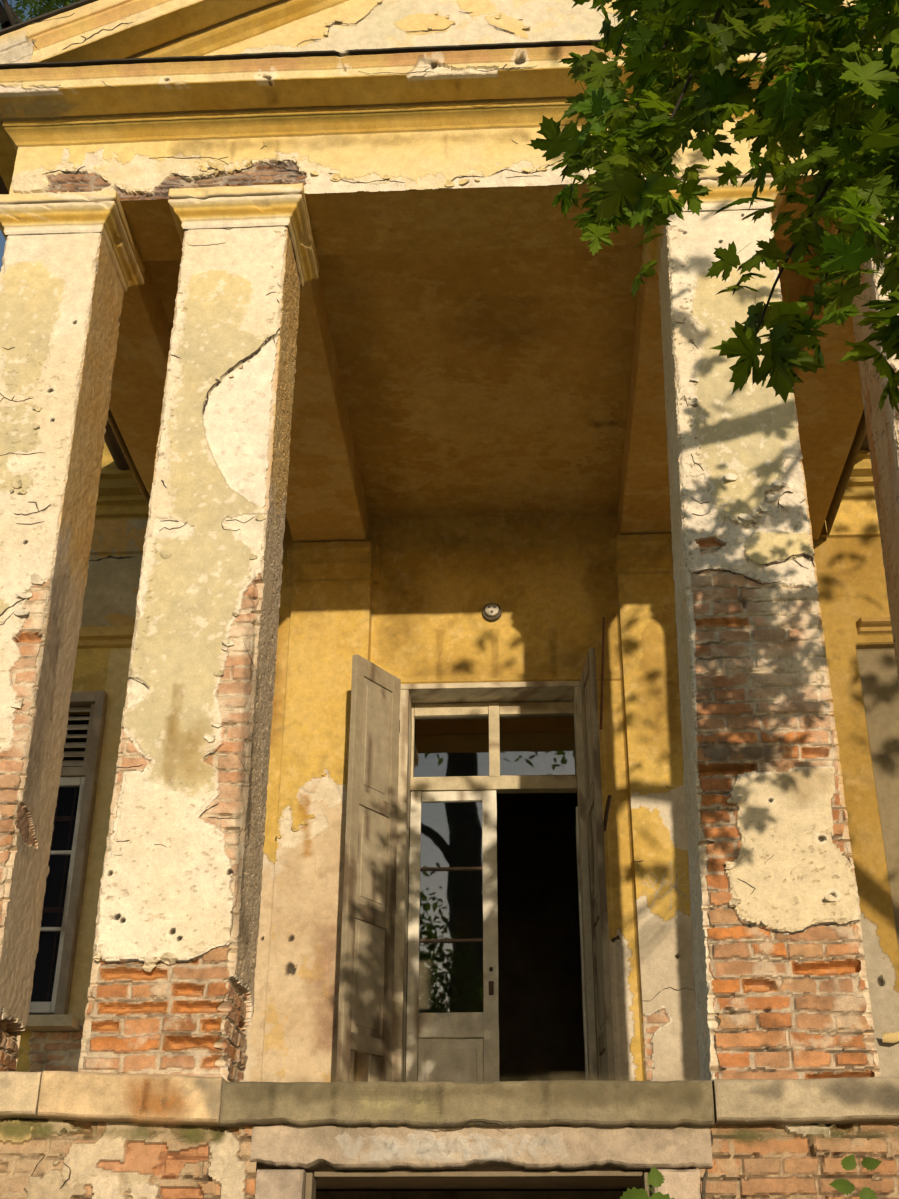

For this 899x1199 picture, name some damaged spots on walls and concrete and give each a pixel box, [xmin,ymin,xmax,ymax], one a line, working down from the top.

peeling [240,0,637,81]
peeling [19,148,596,201]
crack [203,284,280,414]
peeling [0,225,369,1082]
spalling [629,208,899,1079]
peeling [609,896,699,1082]
spalling [0,1119,34,1145]
spalling [62,1131,247,1199]